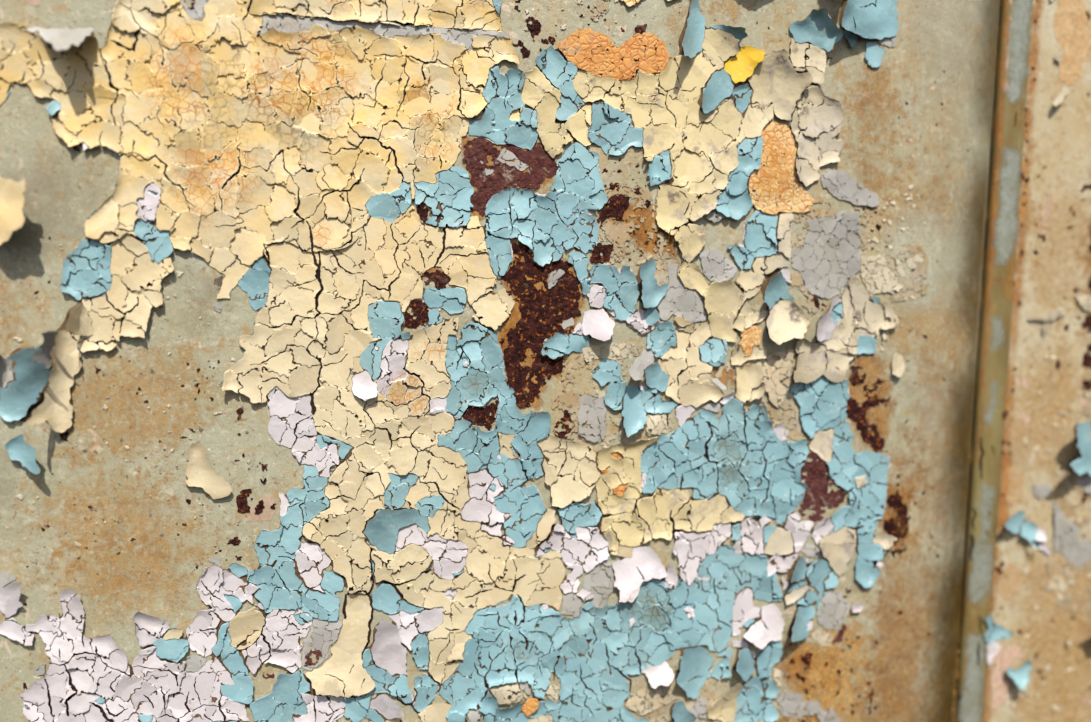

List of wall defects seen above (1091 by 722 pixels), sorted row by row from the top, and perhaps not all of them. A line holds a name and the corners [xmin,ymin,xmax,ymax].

peeling [841,0,899,47]
peeling [0,176,36,245]
corrosion [462,136,558,220]
crack [195,0,579,541]
corrosion [497,241,584,409]
corrosion [463,400,499,431]
peeling [170,436,232,519]
corrosion [798,452,846,522]
crack [33,574,226,722]
crack [342,549,432,657]
crack [436,406,804,722]
peeling [958,615,1075,722]